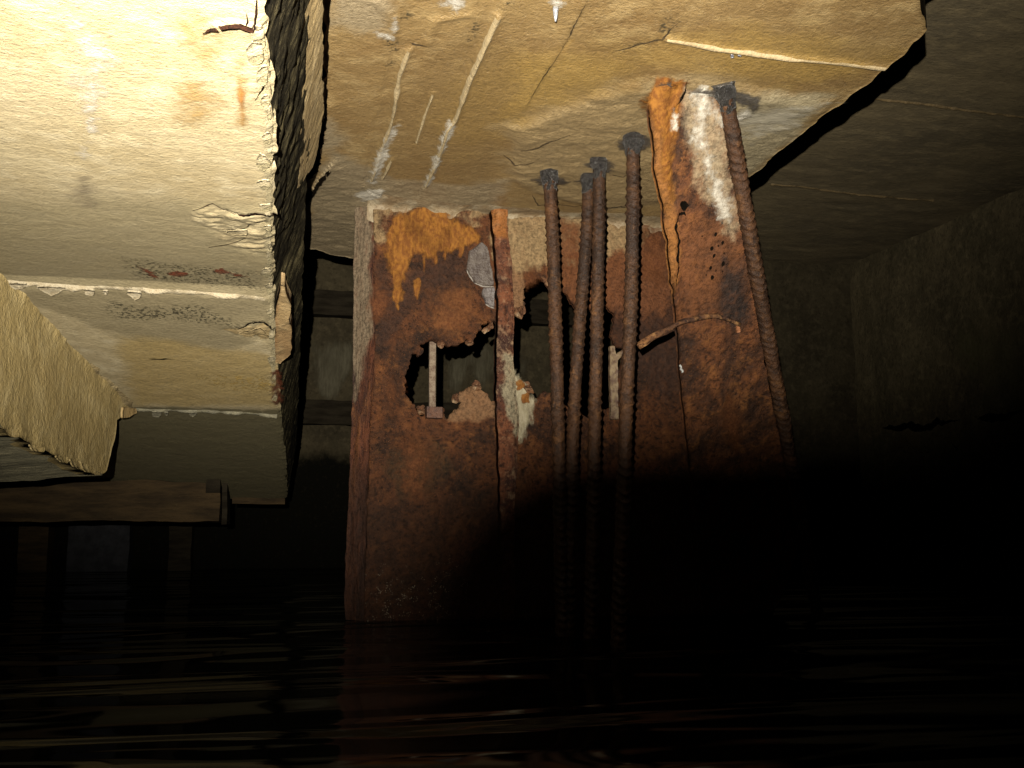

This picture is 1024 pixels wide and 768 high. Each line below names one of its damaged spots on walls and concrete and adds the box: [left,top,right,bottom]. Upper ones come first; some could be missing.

crack [202,0,257,35]
crack [528,6,585,103]
peeling [84,24,292,406]
water stain [356,126,397,202]
rust [372,207,480,316]
water stain [427,120,455,186]
rust [558,218,580,265]
rust [640,78,688,193]
water stain [691,86,730,218]
spalling [540,132,644,648]
spalling [711,81,824,615]